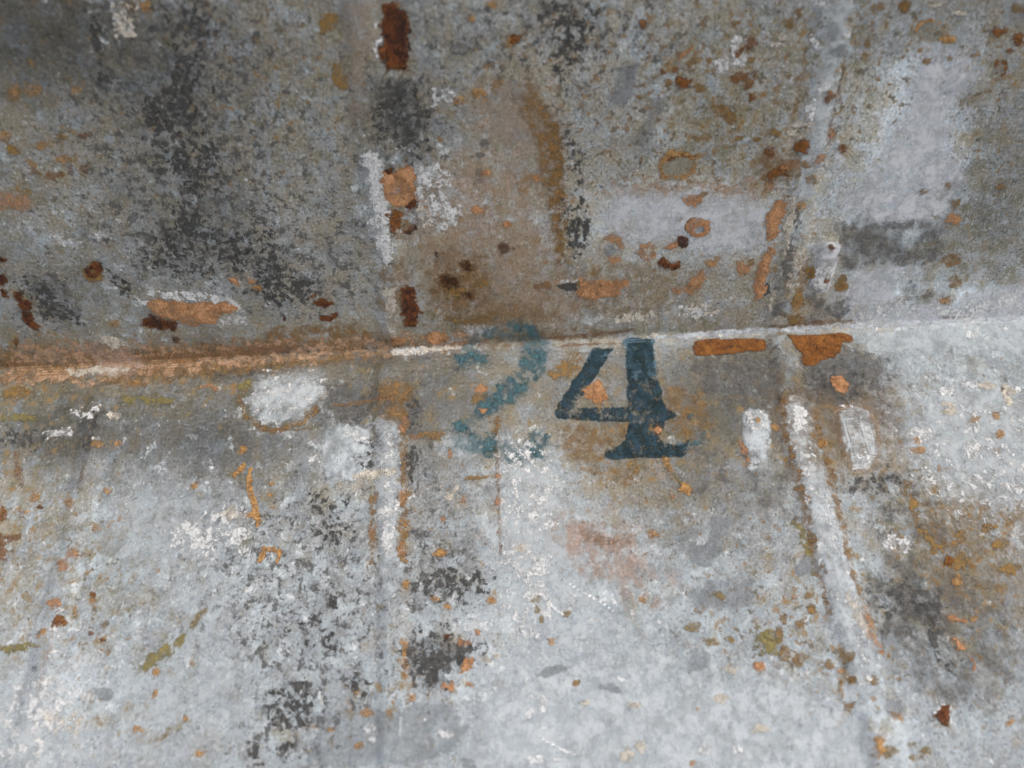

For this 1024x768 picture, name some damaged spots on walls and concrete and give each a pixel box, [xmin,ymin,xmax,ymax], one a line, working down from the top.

corrosion [373,0,412,73]
corrosion [731,35,760,101]
corrosion [380,164,420,236]
corrosion [599,104,826,303]
corrosion [434,243,515,300]
corrosion [835,274,848,292]
corrosion [0,257,498,422]
leakage [238,364,346,433]
corrosion [542,329,632,380]
corrosion [666,338,781,436]
corrosion [772,291,891,407]
corrosion [930,530,970,586]